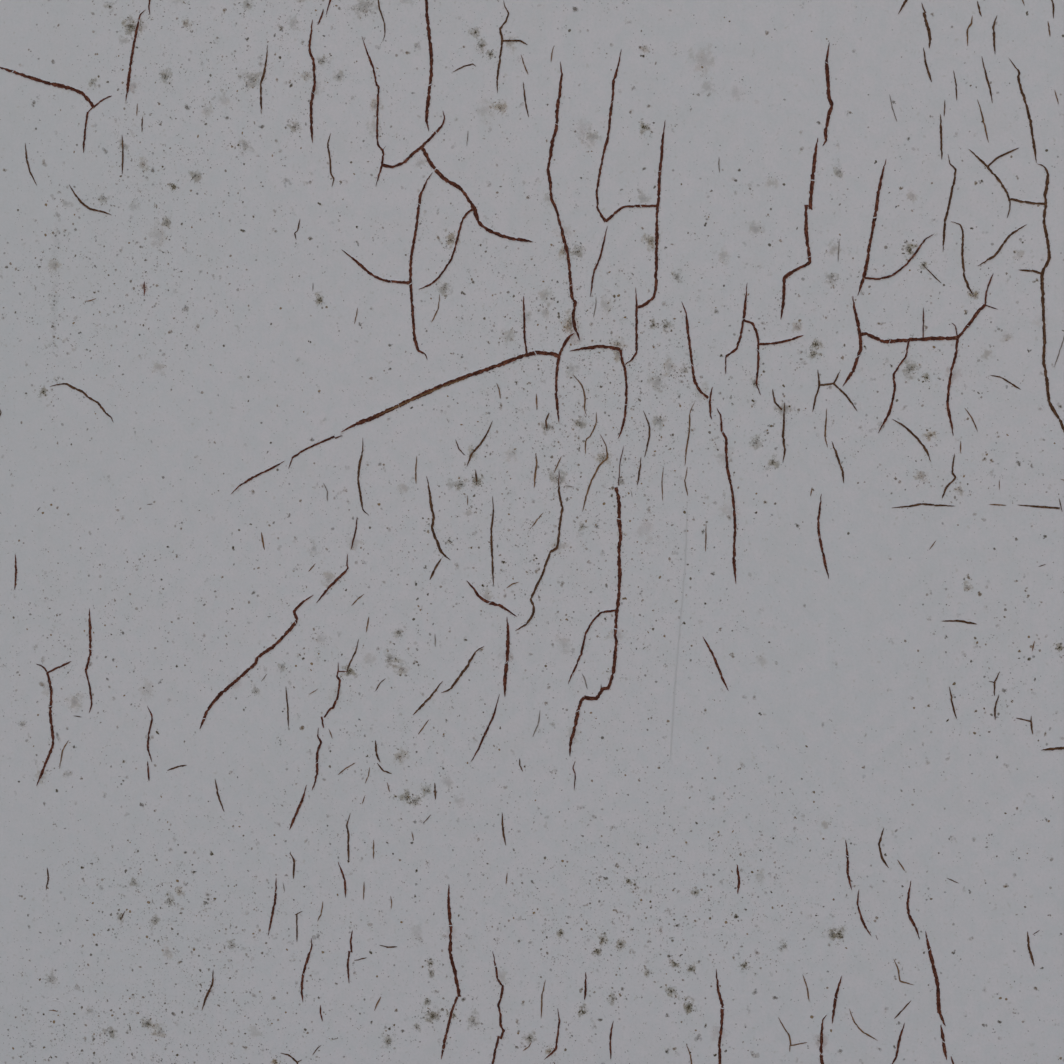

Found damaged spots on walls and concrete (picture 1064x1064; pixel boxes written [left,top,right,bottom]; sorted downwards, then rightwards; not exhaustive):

crack [0,0,151,173]
crack [69,184,112,216]
crack [810,0,1064,579]
crack [49,383,114,423]
crack [199,0,834,789]
crack [36,608,93,786]
crack [989,672,1064,751]
crack [268,594,397,1064]
crack [441,884,462,1060]
crack [491,951,561,1064]
crack [778,828,954,1064]
crack [1027,930,1040,966]